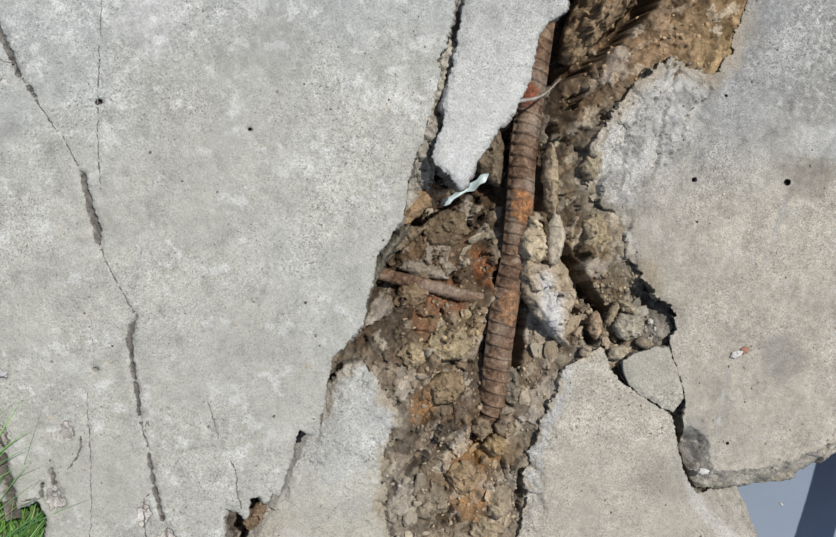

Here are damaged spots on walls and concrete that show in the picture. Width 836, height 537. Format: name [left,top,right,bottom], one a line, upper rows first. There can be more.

crack [405,0,462,211]
rust [522,81,538,105]
rust [510,188,534,223]
crack [0,0,168,537]
spalling [328,0,749,537]
rust [427,294,464,315]
rust [496,290,518,326]
crack [618,345,685,415]
crack [230,461,242,508]
spalling [227,511,247,537]